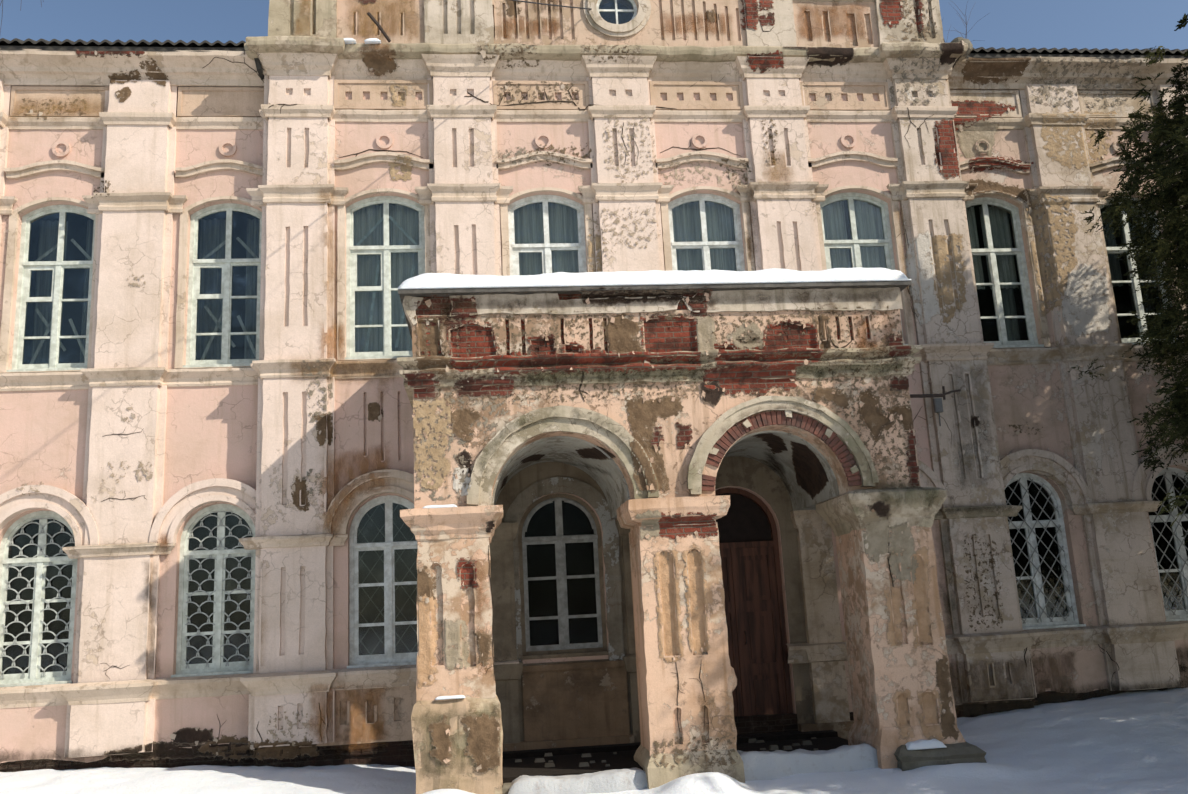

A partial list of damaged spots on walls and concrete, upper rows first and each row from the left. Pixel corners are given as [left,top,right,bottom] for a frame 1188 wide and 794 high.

spalling [740,0,775,30]
peeling [879,0,1144,170]
peeling [588,206,661,272]
peeling [905,230,968,325]
peeling [934,99,1113,337]
peeling [368,402,384,421]
peeling [291,469,326,512]
spalling [403,286,933,664]
peeling [417,566,492,688]
spalling [892,655,959,741]
water stain [949,649,1188,717]